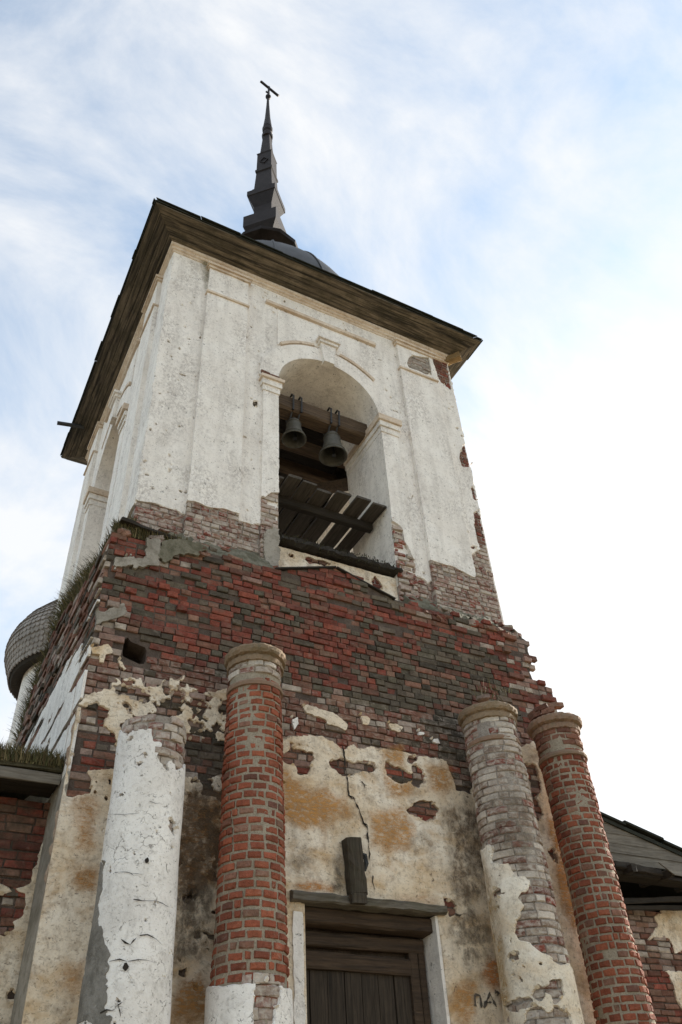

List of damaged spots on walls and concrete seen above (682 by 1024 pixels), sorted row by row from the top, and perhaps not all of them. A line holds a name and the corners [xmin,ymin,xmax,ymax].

spalling [407,354,451,388]
spalling [471,486,486,549]
spalling [118,677,226,791]
spalling [283,745,313,774]
spalling [329,754,425,788]
crack [342,745,375,889]
spalling [406,801,438,821]
spalling [0,880,31,936]
damp [176,788,218,957]
damp [447,809,489,957]
crack [112,934,158,963]
spalling [504,979,571,1024]